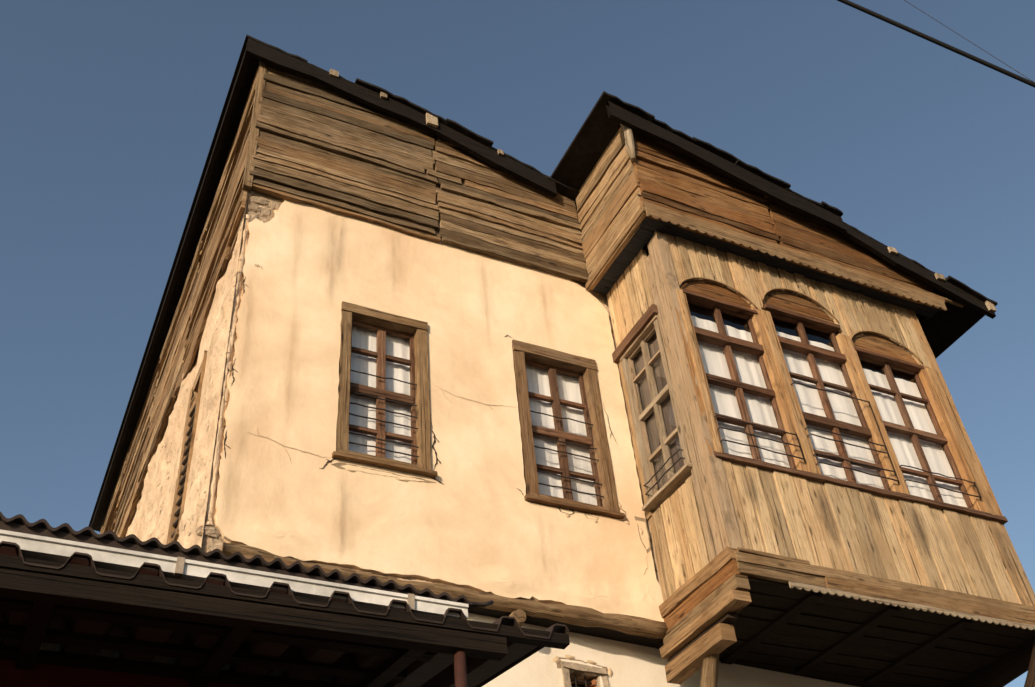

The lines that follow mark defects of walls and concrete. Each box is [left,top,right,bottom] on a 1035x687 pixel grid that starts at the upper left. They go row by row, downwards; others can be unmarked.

spalling [243,190,282,223]
crack [224,428,336,469]
spalling [195,516,226,553]